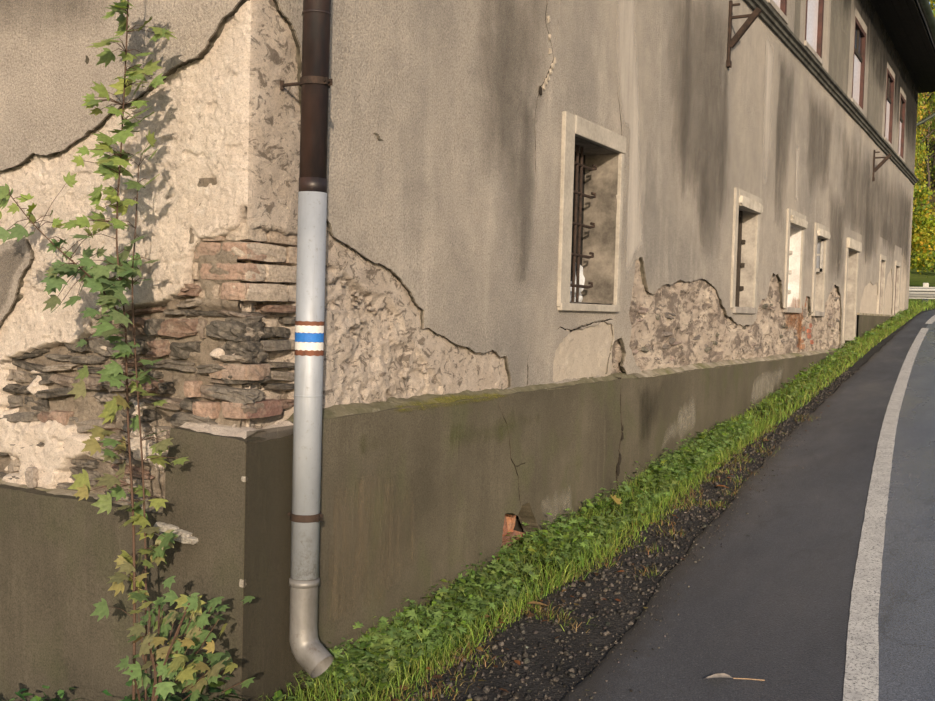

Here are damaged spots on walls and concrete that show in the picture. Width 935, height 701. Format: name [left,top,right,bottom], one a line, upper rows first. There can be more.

crack [535,5,559,115]
leakage [620,0,640,263]
leakage [765,45,790,172]
leakage [810,105,828,174]
spalling [0,0,302,503]
spalling [322,218,511,409]
spalling [553,257,842,382]
crack [615,377,624,490]
spalling [498,513,526,559]